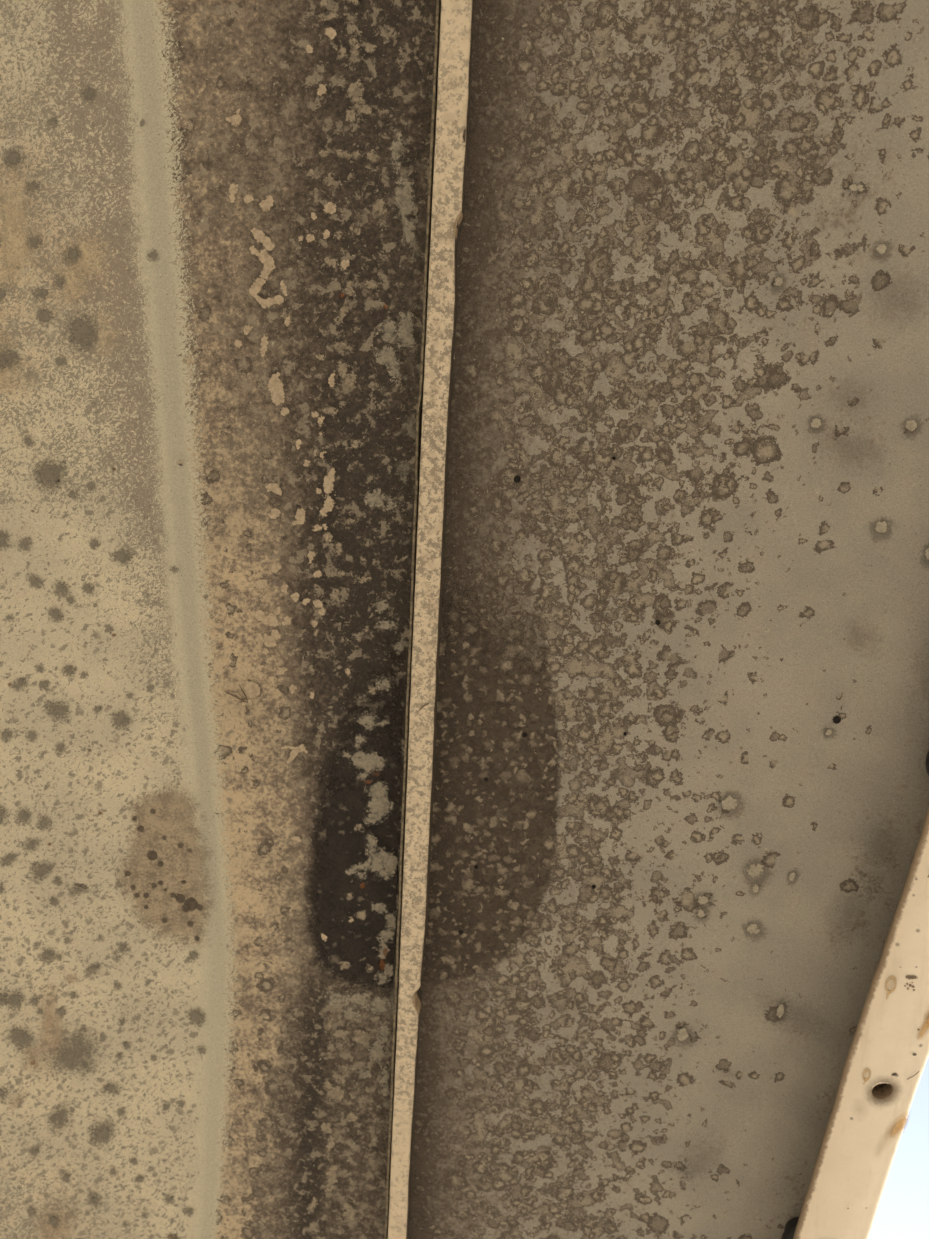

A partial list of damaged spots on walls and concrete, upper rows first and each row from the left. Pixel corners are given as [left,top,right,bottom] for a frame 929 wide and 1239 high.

damp [122,791,208,960]
damp [306,642,404,993]
damp [421,589,559,984]